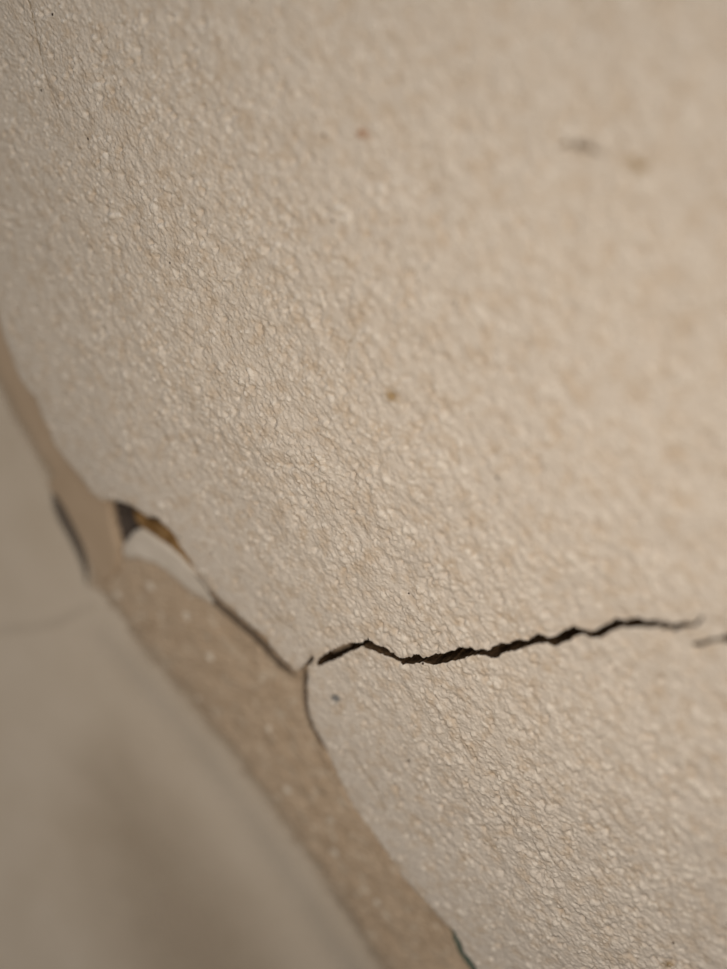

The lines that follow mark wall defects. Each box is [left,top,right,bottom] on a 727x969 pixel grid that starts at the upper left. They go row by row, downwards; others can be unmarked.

flaking render [114,502,216,605]
crack [196,575,727,750]
flaking render [450,928,476,969]